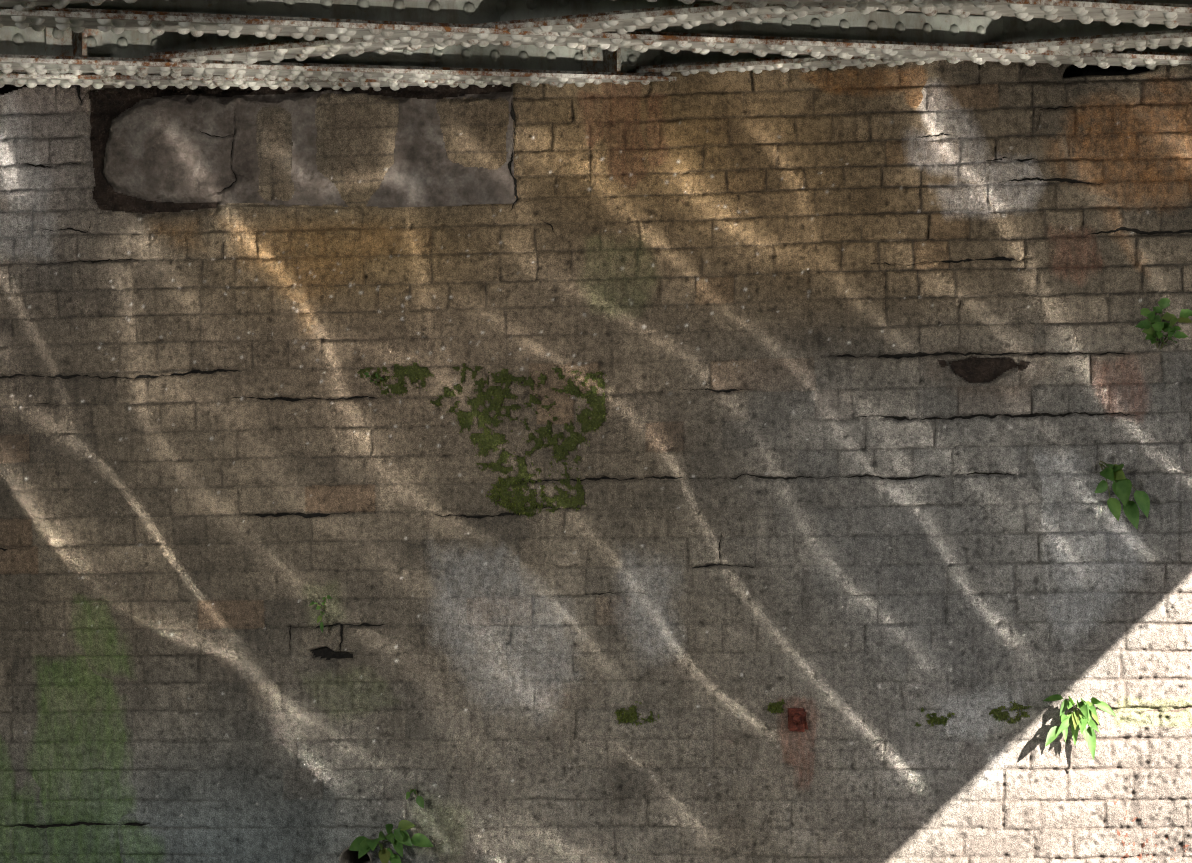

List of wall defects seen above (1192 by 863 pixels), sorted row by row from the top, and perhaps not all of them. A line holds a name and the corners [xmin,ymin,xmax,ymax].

crack [986,157,1103,185]
crack [1088,227,1192,235]
crack [871,256,1027,265]
crack [827,351,1127,359]
spalling [938,356,1031,383]
crack [683,386,751,394]
crack [434,472,1012,519]
crack [254,511,348,519]
rust [772,693,824,795]
leakage [0,723,50,863]
crack [0,821,150,829]
leakage [118,813,174,863]